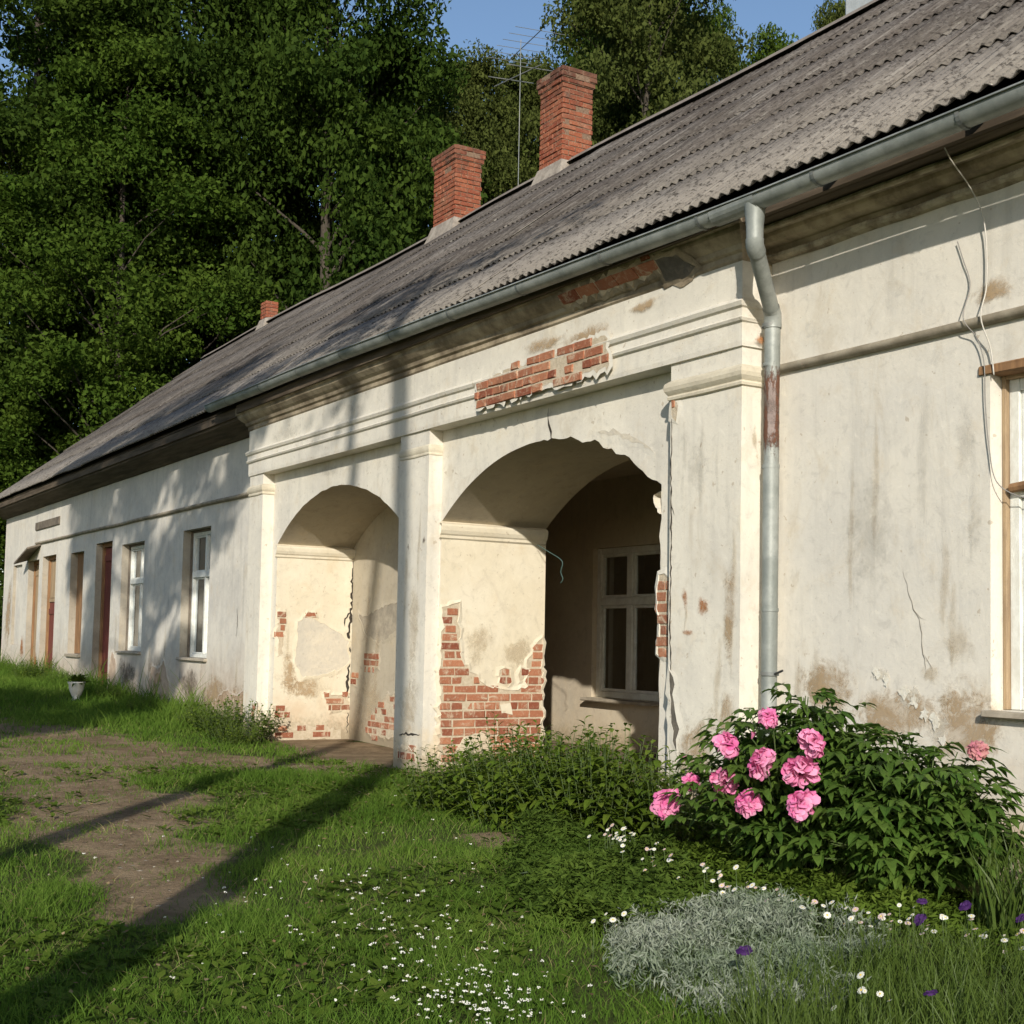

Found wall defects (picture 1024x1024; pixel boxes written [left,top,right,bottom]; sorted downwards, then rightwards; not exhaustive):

spalling [557,246,702,313]
spalling [474,330,613,411]
corrosion [763,368,780,450]
flaking render [269,599,397,741]
crack [344,561,353,732]
spalling [433,600,547,770]
spalling [654,567,684,756]
water stain [807,667,850,711]
water stain [866,695,929,736]
peeling [872,666,947,746]
water stain [943,691,996,752]